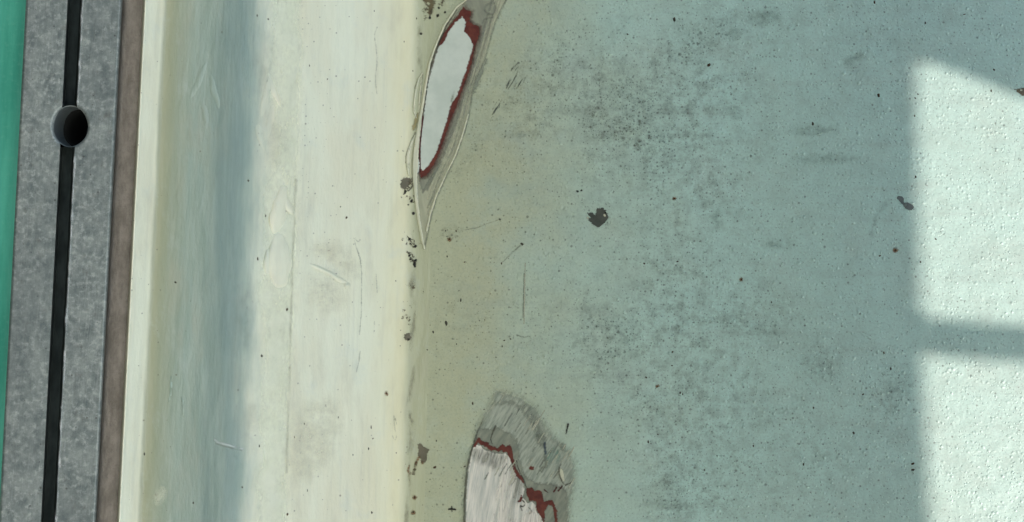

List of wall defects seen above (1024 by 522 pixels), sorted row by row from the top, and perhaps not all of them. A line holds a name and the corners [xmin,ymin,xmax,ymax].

peeling [400,0,505,249]
peeling [463,391,575,522]